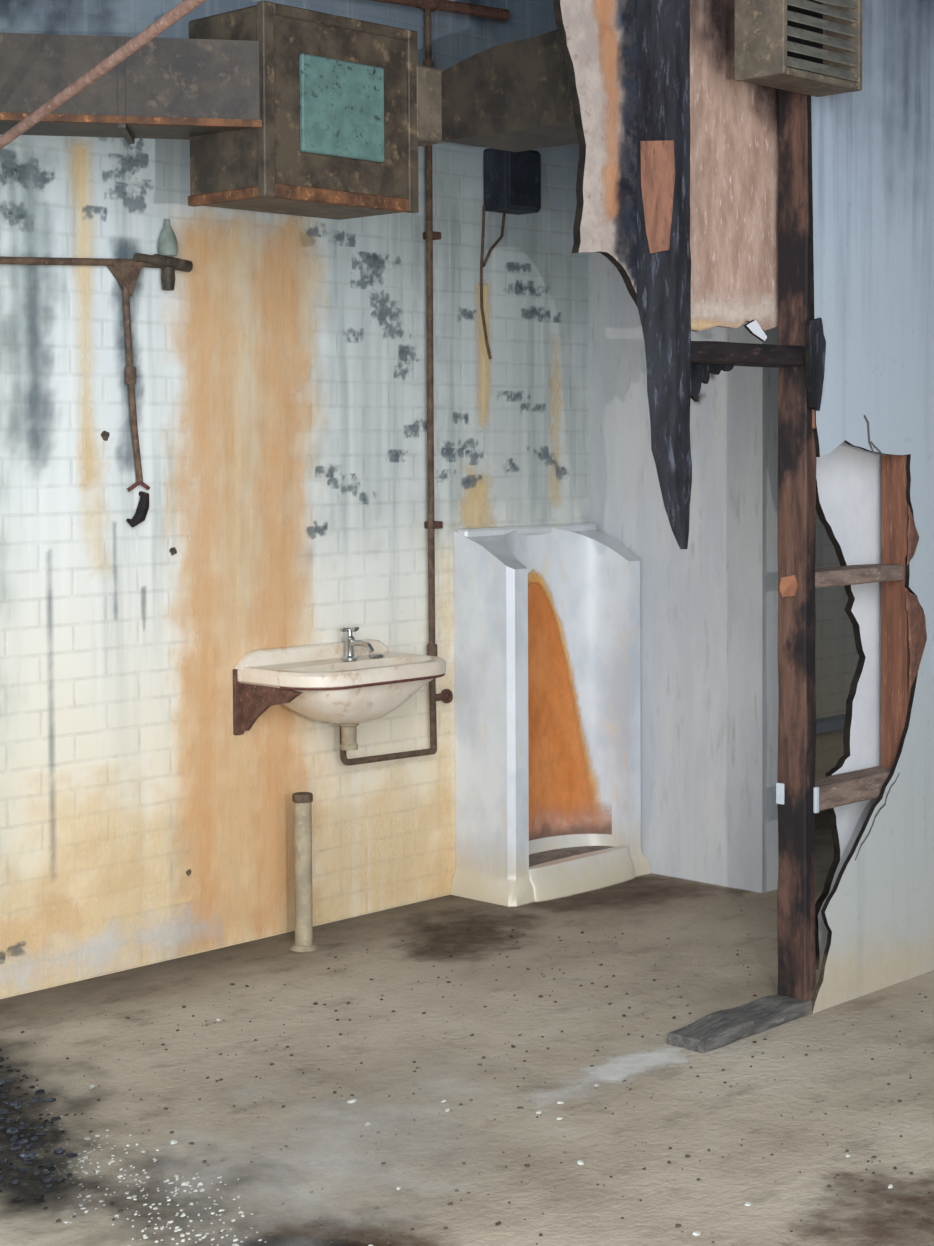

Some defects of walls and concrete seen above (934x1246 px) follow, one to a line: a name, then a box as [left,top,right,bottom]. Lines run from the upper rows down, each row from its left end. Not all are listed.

rust [595,0,620,217]
peeling [640,140,675,254]
damp [27,168,35,365]
peeling [508,263,560,323]
peeling [440,439,483,488]
peeling [535,446,566,480]
spalling [907,505,919,566]
spalling [905,591,927,693]